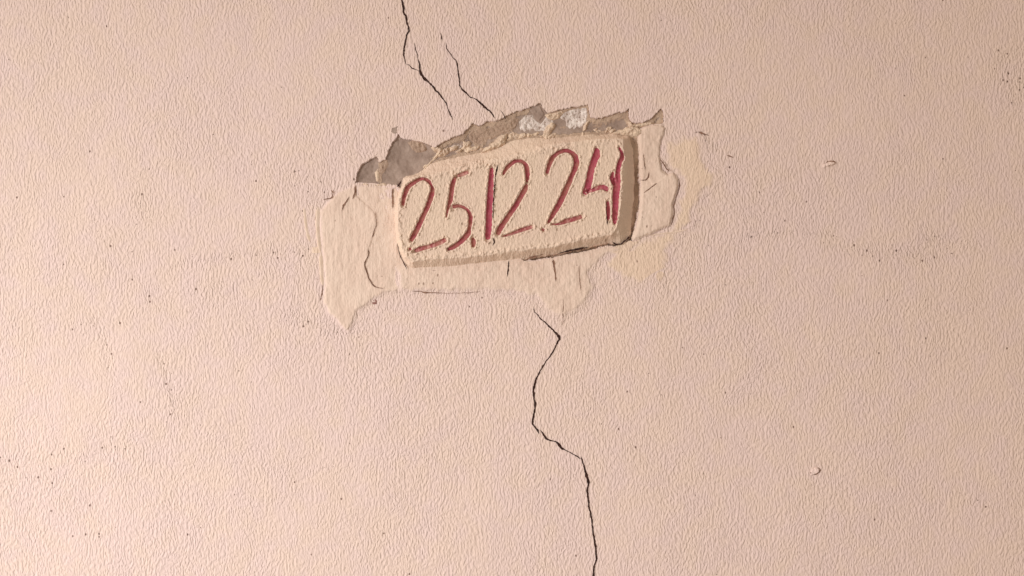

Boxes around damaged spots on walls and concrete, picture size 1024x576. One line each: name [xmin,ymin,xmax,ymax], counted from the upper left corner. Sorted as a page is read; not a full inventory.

crack [401,0,506,120]
spalling [323,104,664,241]
crack [532,273,598,576]